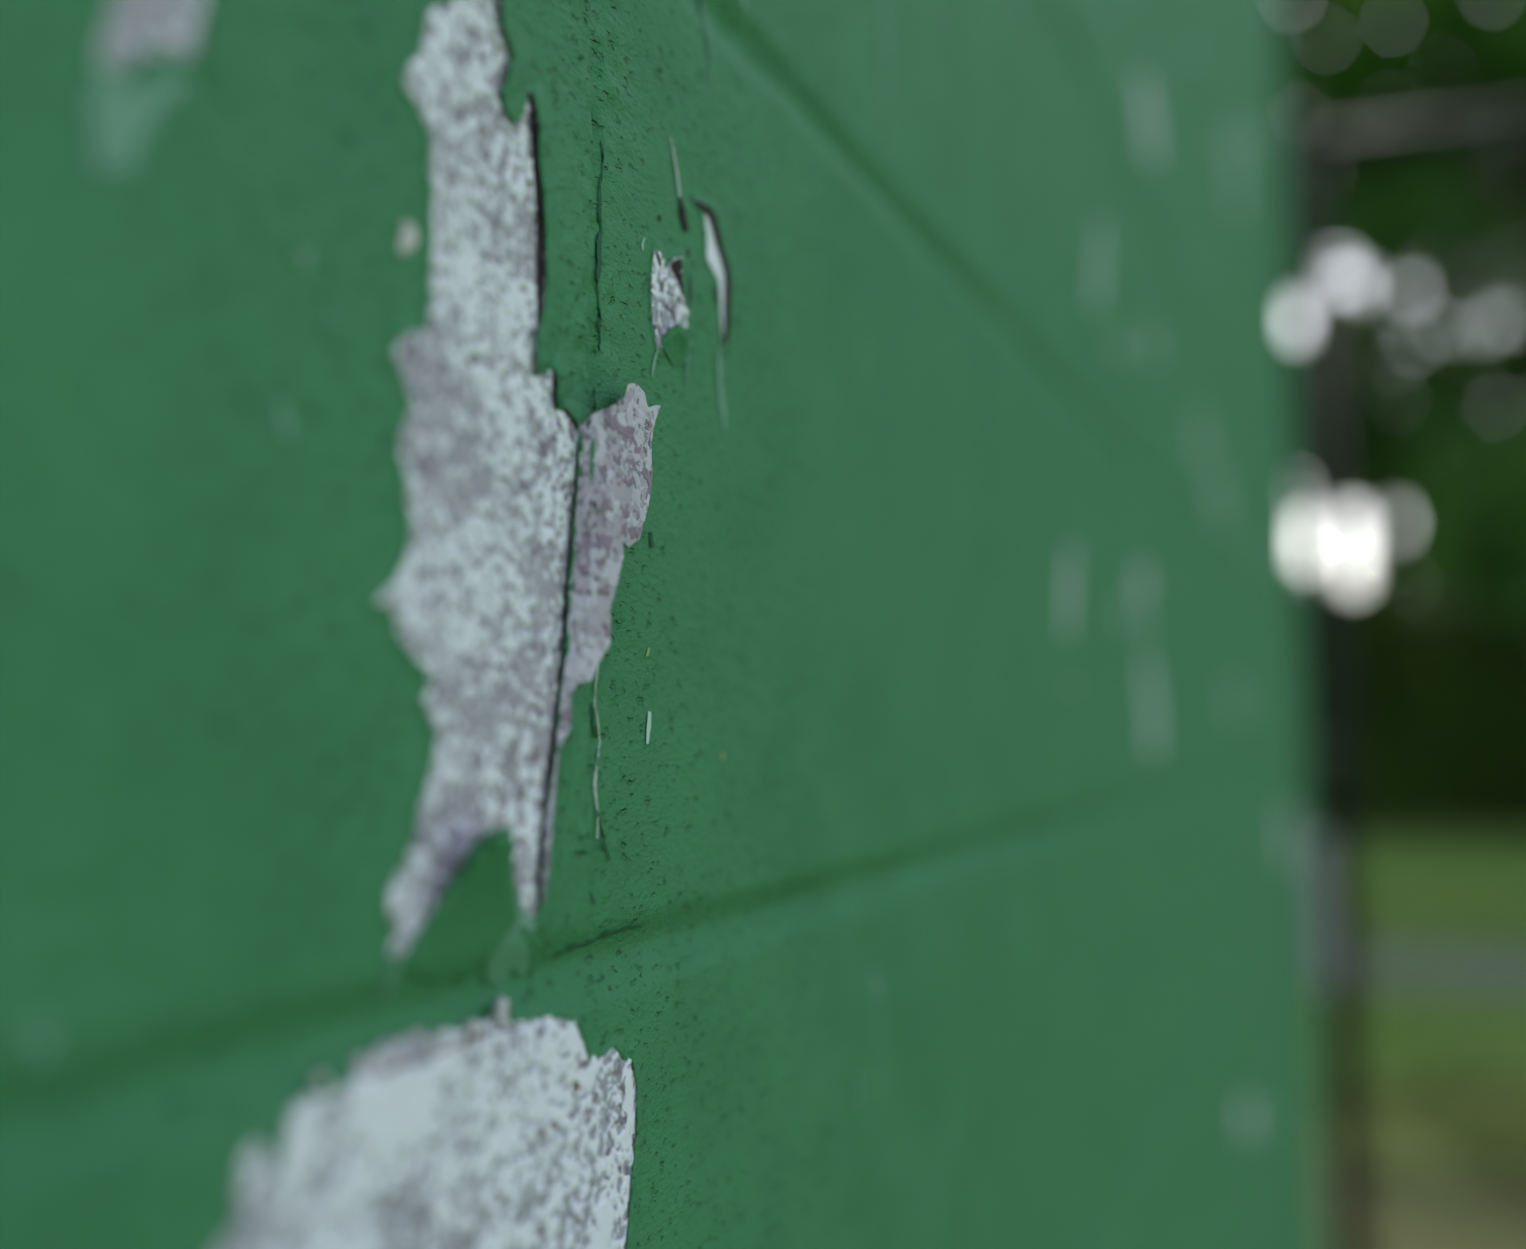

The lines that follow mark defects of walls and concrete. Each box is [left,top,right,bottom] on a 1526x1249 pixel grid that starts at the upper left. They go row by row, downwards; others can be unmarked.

peeling [89,0,237,90]
peeling [648,191,737,358]
peeling [365,0,661,978]
peeling [207,977,647,1249]